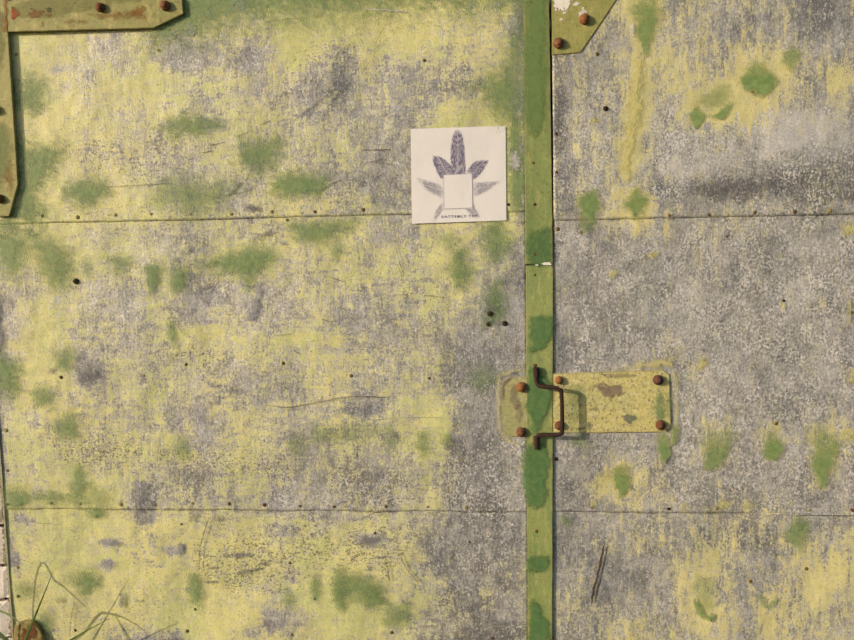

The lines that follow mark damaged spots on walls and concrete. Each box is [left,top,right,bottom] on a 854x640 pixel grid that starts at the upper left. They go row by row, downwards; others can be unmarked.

rust [2,0,51,32]
peeling [553,0,587,21]